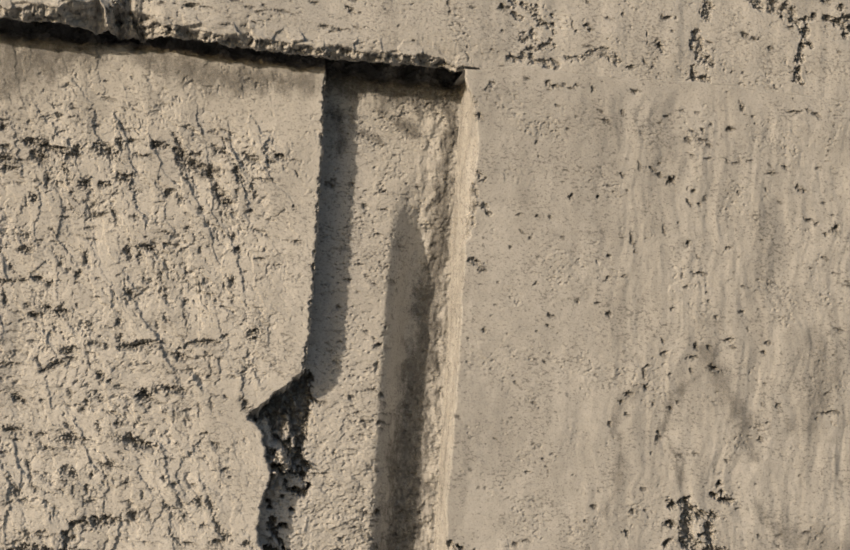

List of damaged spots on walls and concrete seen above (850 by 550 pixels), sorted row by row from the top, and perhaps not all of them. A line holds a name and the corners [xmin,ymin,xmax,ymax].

spalling [252,371,313,496]
spalling [263,498,288,550]